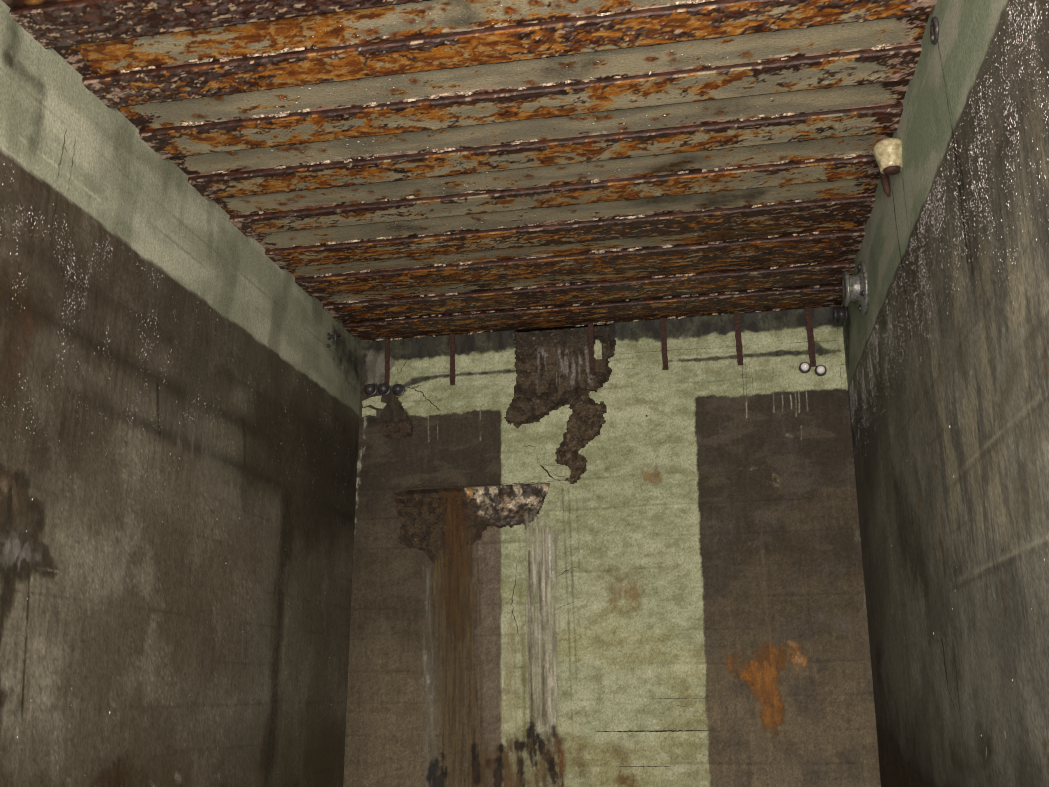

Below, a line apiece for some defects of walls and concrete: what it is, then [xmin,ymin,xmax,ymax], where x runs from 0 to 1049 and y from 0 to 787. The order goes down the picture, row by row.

rust [363,7,432,40]
rust [528,0,593,14]
peeling [359,335,435,441]
spalling [504,321,616,484]
leakage [0,465,56,642]
spalling [394,483,550,570]
leakage [472,514,558,787]
rust [727,642,808,734]
leakage [426,741,447,787]